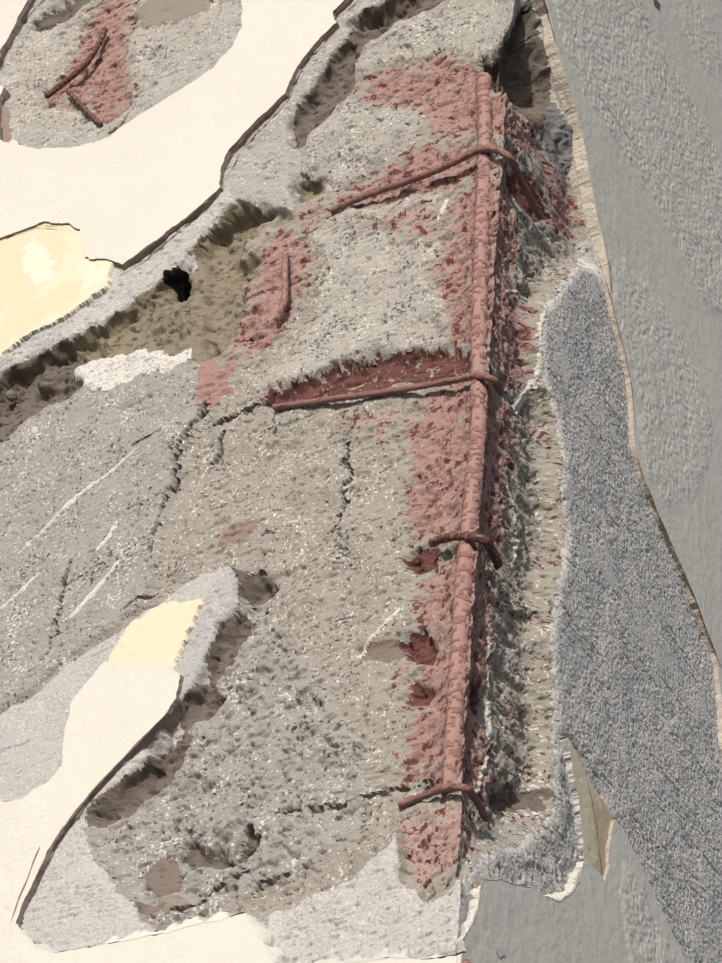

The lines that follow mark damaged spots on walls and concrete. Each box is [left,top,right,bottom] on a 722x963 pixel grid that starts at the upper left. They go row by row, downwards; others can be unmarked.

rust [29,0,146,130]
spalling [14,194,462,963]
spalling [0,0,589,714]
rust [189,45,588,893]
flaking render [314,878,507,963]
spalling [399,380,568,903]
flaking render [545,861,584,902]
flaking render [580,177,608,267]